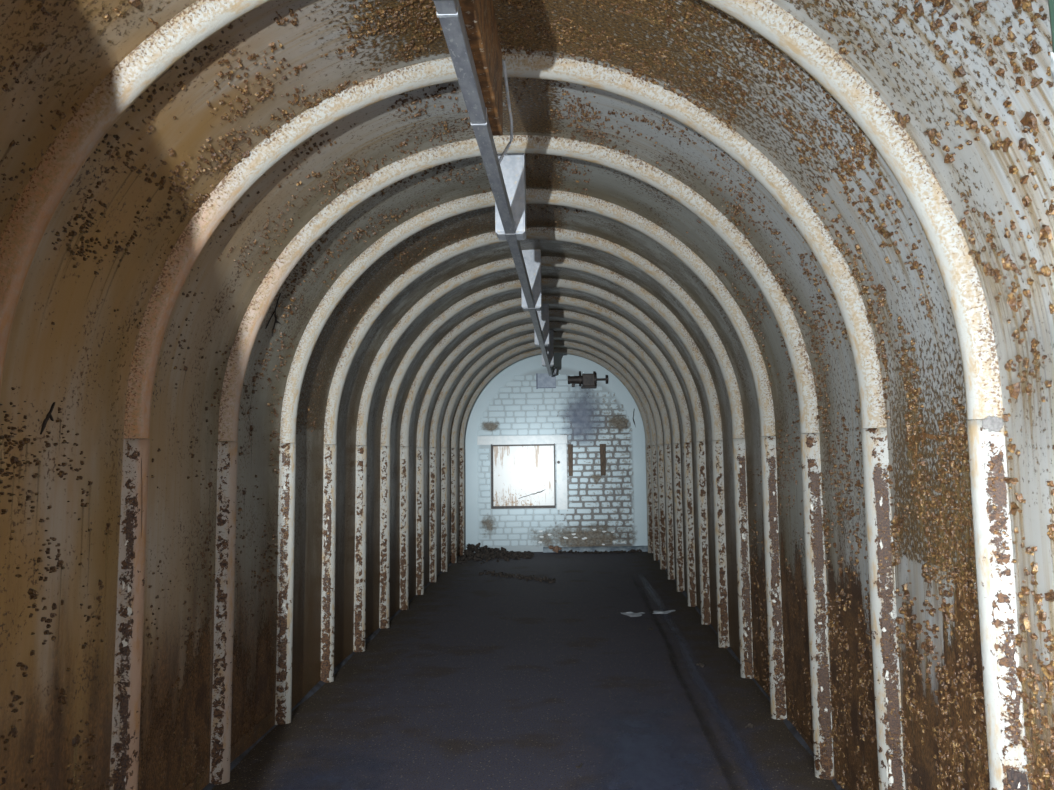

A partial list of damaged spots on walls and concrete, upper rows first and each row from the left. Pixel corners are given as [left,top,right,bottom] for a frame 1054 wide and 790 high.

peeling [115,505,135,790]
peeling [278,450,291,663]
peeling [738,454,753,665]
peeling [767,453,785,704]
peeling [809,469,833,757]
peeling [872,463,904,790]
rust [786,0,1054,790]
peeling [982,416,1003,432]
peeling [985,450,1010,573]
peeling [994,607,1022,749]
peeling [1006,765,1028,790]